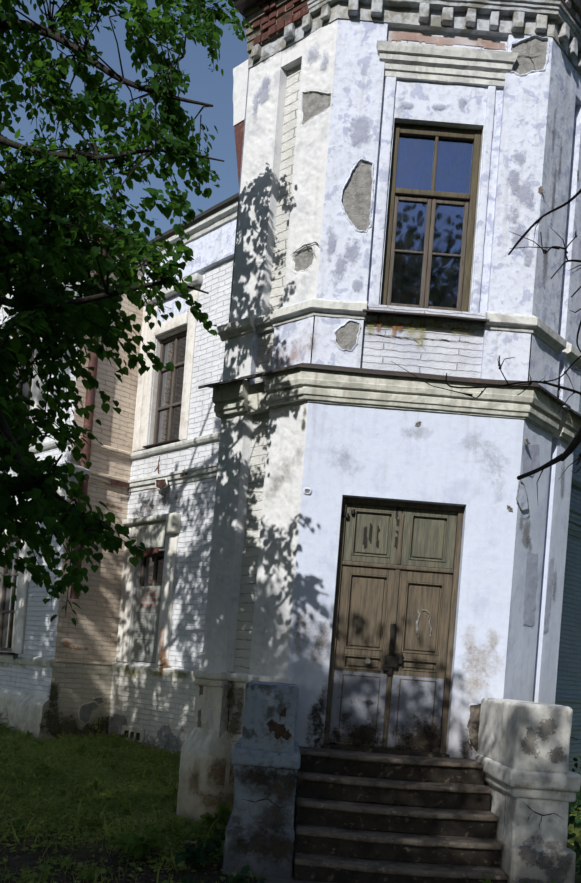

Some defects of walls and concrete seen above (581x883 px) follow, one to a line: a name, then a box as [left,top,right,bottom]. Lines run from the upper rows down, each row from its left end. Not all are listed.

flaking render [388,29,550,77]
flaking render [300,90,333,127]
flaking render [327,158,375,273]
flaking render [291,246,315,274]
flaking render [333,319,362,352]
flaking render [266,707,292,740]
crack [527,805,563,831]